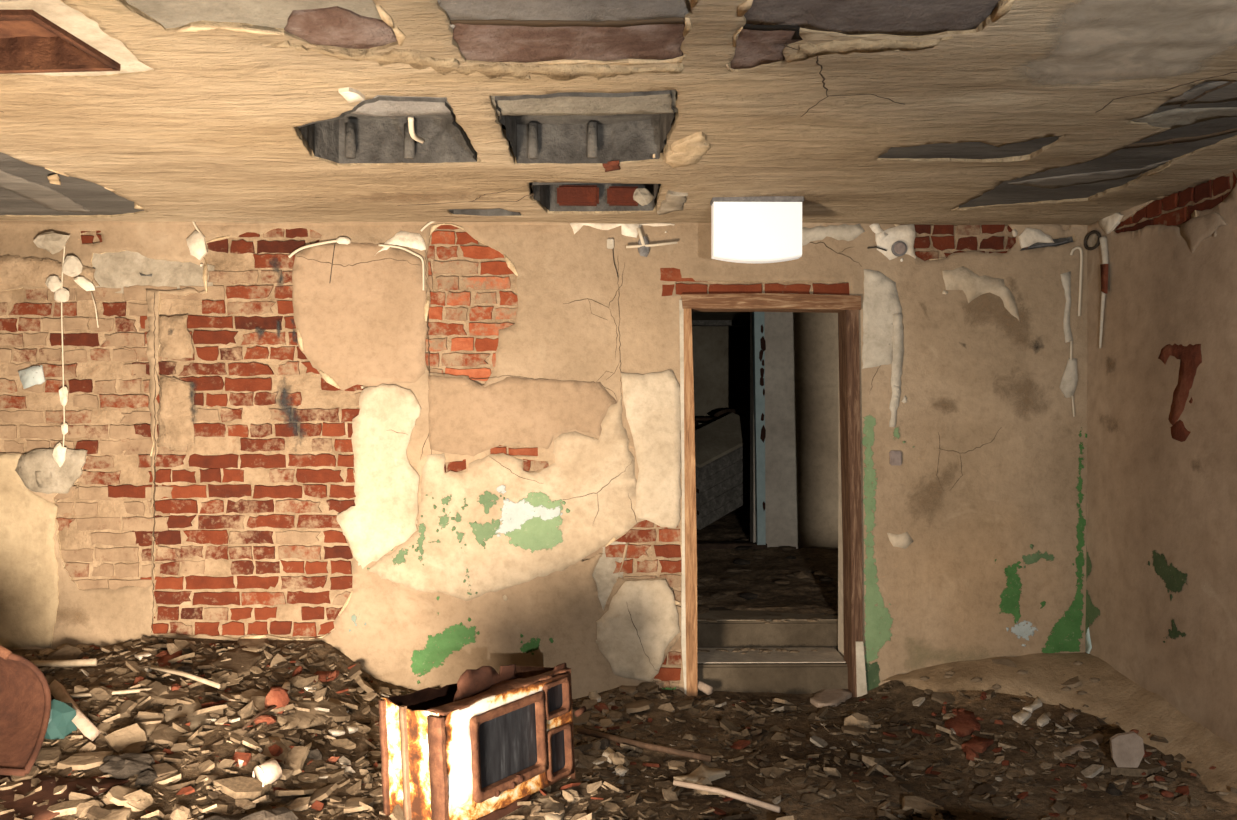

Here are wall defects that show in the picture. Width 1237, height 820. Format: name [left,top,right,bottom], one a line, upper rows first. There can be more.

spalling [0,0,153,76]
peeling [339,87,365,103]
peeling [176,5,686,81]
crack [784,44,905,117]
peeling [782,36,952,64]
peeling [45,168,69,185]
flaking render [1098,172,1237,253]
flaking render [0,223,682,690]
crack [936,427,1002,488]
peeling [994,422,1100,654]
peeling [1148,550,1187,600]
peeling [347,662,380,697]